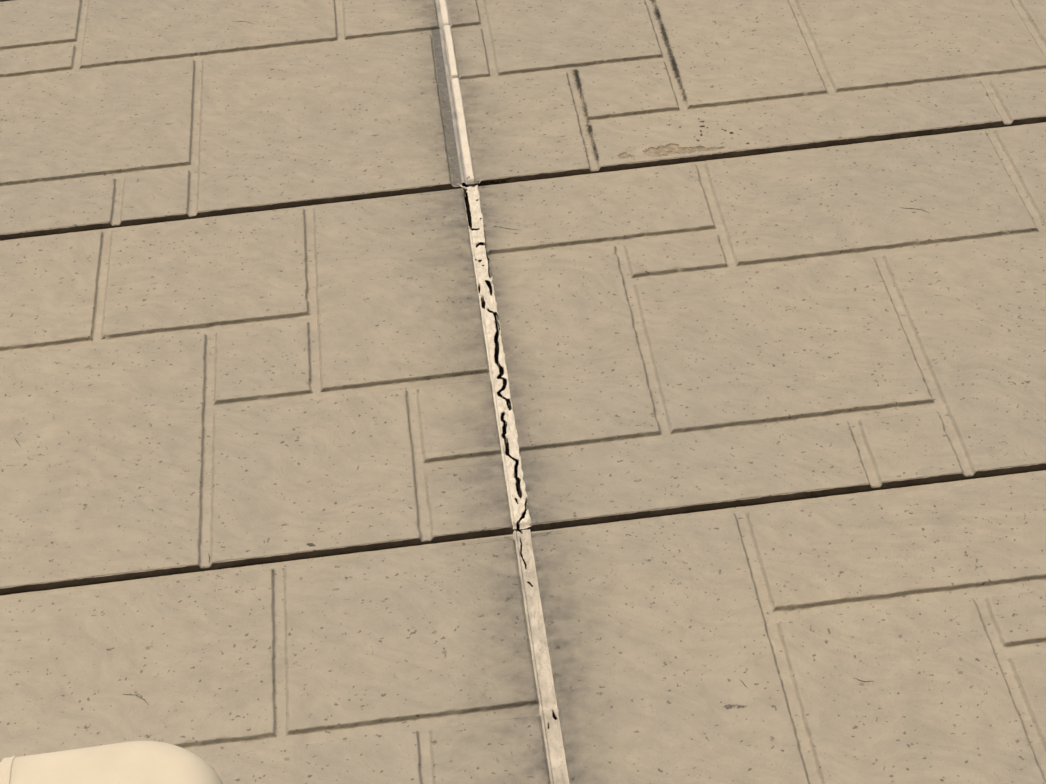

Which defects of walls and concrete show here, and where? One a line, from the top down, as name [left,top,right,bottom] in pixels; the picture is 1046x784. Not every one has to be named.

spalling [618,143,725,159]
crack [478,280,533,587]